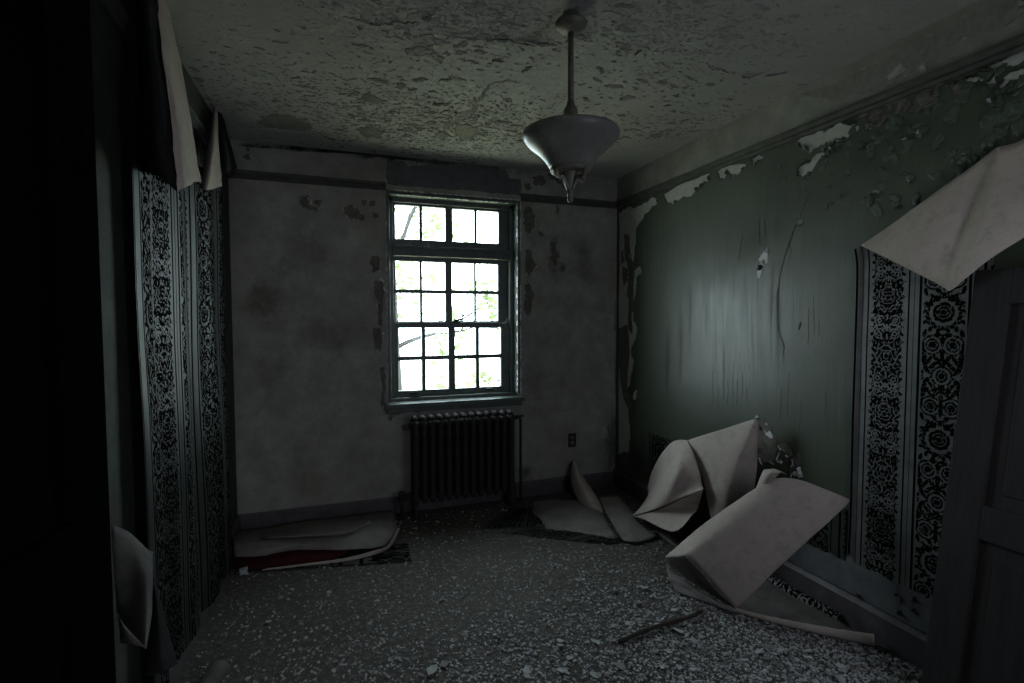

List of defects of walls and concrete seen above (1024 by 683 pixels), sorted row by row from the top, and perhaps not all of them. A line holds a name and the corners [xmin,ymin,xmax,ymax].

peeling [187,0,787,394]
peeling [618,154,764,454]
crack [739,191,812,359]
peeling [795,120,859,179]
peeling [955,51,1024,105]
flaking render [755,415,803,478]